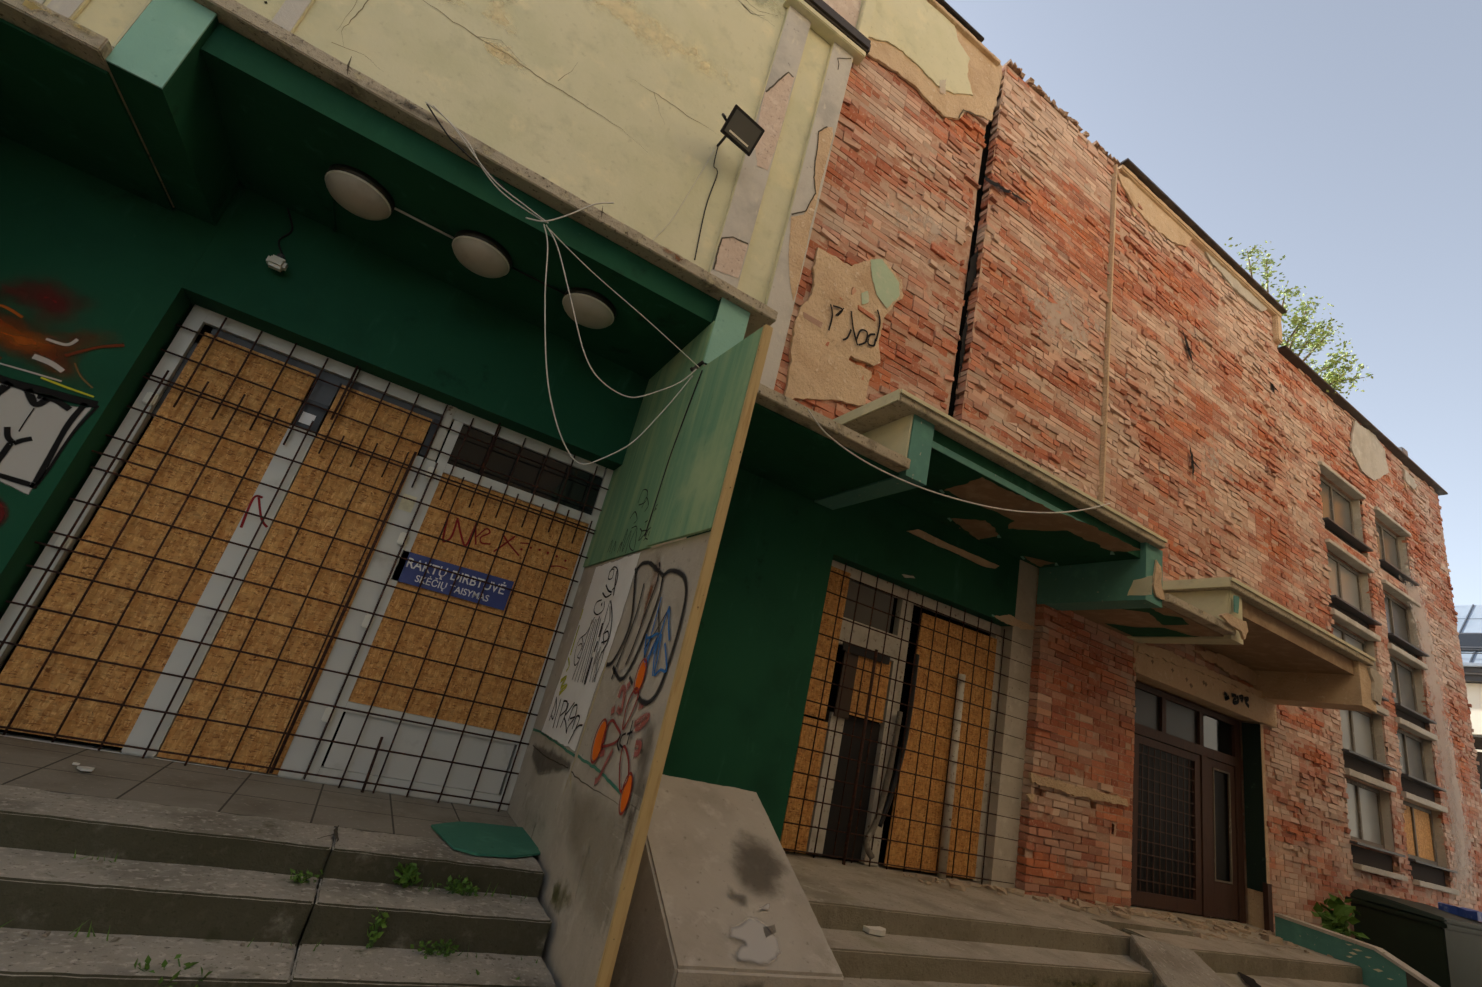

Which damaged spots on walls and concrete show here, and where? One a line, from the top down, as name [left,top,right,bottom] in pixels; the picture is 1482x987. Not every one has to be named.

crack [332,0,377,75]
crack [423,0,714,151]
spalling [755,71,795,170]
spalling [713,236,748,278]
flaking render [783,126,904,406]